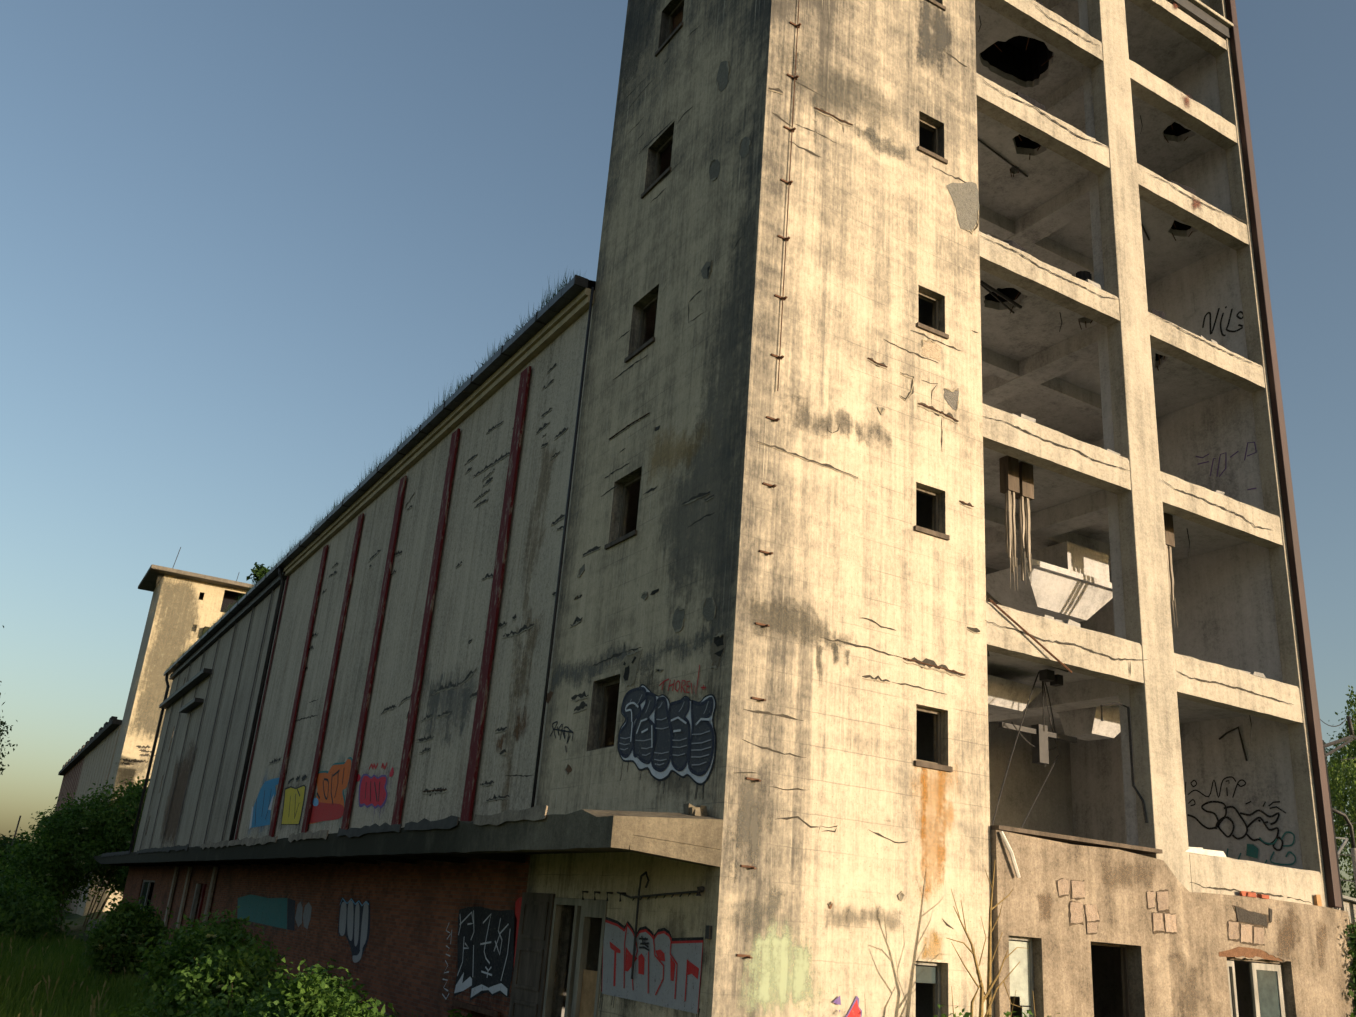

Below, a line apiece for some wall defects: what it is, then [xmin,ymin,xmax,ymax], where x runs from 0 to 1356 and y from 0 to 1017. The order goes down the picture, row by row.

spalling [946,182,979,234]
water stain [131,578,198,739]
water stain [751,598,849,677]
crack [820,618,945,694]
spalling [381,695,453,755]
water stain [119,760,149,784]
water stain [1038,895,1051,919]
water stain [1317,926,1326,967]